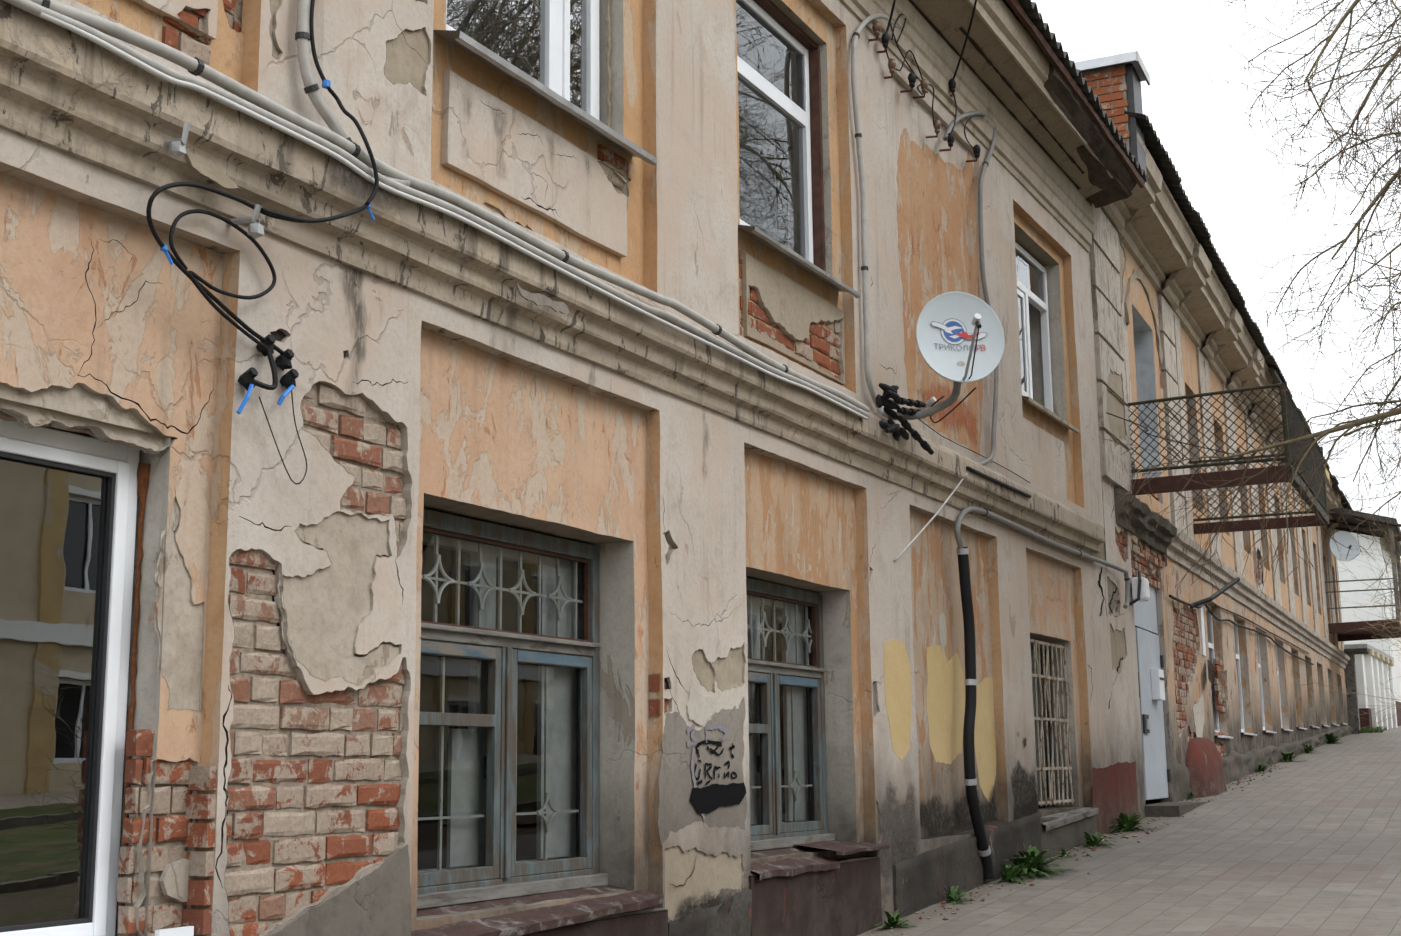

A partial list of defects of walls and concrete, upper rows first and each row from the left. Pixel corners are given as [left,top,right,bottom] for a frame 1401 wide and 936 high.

flaking render [162,0,243,66]
spalling [384,27,431,96]
crack [481,101,573,213]
crack [78,239,215,434]
flaking render [739,250,844,386]
spalling [0,382,177,454]
flaking render [117,381,412,936]
spalling [649,644,746,725]
flaking render [1115,526,1228,756]
leakage [1011,734,1039,820]
leakage [881,788,997,875]
spalling [664,845,744,921]